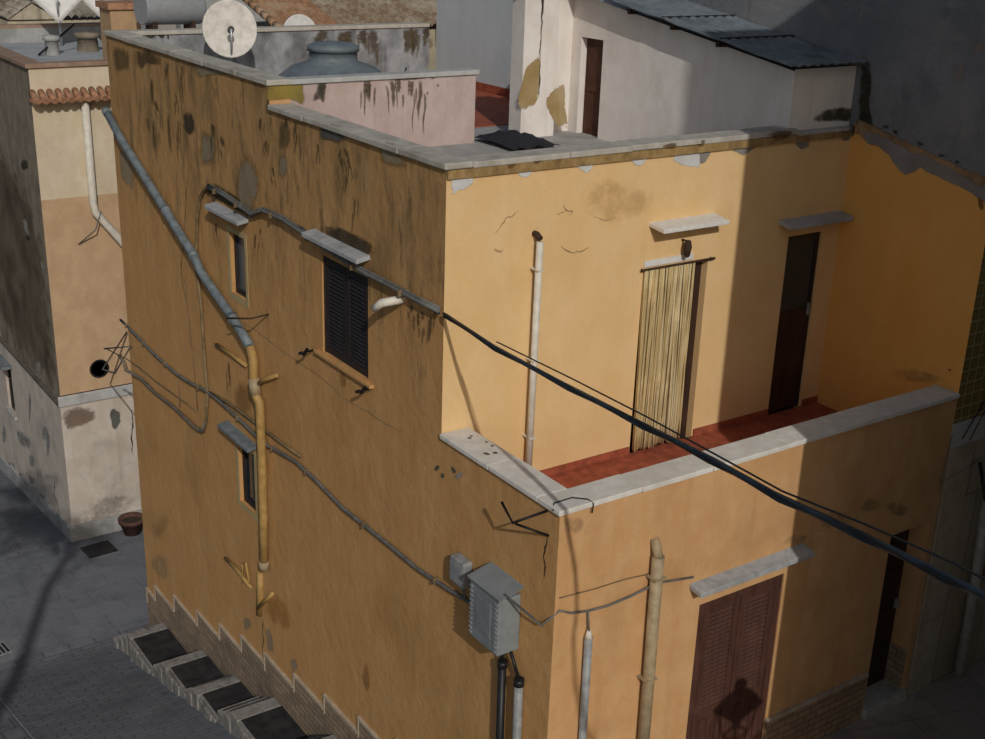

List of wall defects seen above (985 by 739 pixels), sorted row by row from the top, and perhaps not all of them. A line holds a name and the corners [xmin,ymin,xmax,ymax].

damp [338,30,379,62]
damp [404,27,436,53]
crack [537,0,545,98]
damp [360,81,375,113]
damp [387,77,439,128]
flaking render [518,58,567,126]
damp [816,63,872,134]
flaking render [856,120,985,188]
flaking render [64,408,93,429]